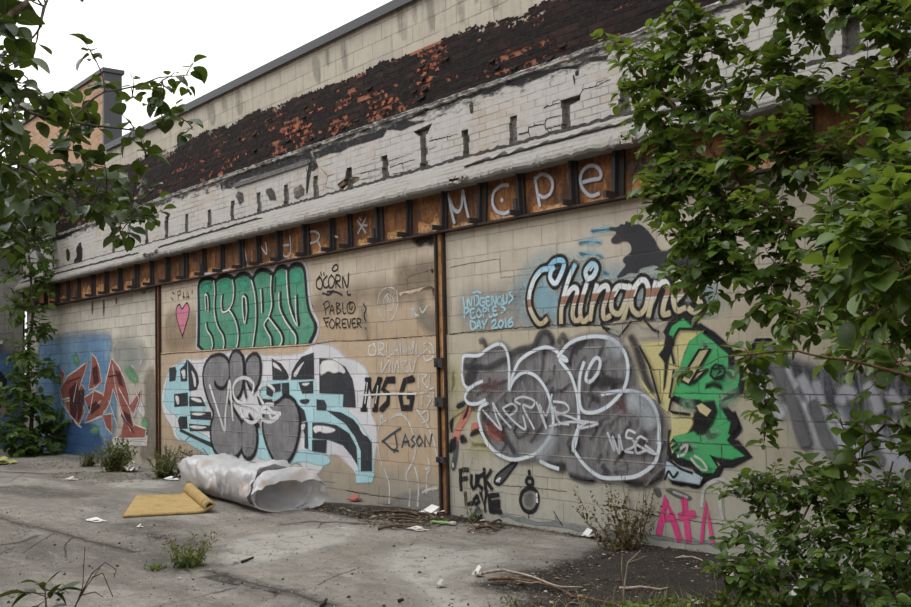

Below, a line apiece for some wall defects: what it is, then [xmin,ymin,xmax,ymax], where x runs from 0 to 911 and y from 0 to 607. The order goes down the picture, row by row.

crack [758,45,878,76]
peeling [121,0,719,204]
crack [706,82,734,100]
crack [21,78,687,283]
peeling [25,176,117,242]
corrosion [490,197,514,220]
corrosion [533,204,566,213]
corrosion [172,245,252,281]
corrosion [418,205,446,467]